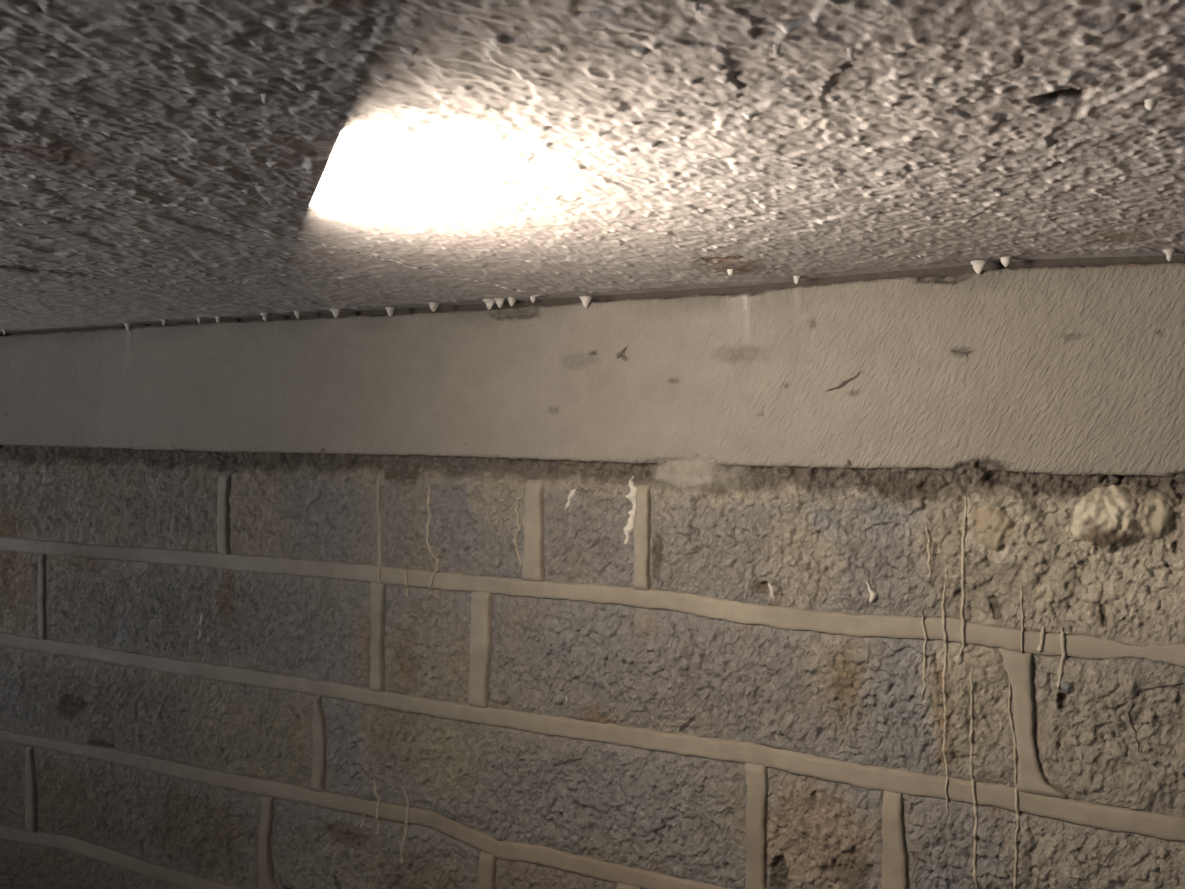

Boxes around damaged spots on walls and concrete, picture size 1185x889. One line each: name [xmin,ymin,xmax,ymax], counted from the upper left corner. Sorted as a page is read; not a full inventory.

spalling [977,460,1018,484]
leakage [925,495,979,889]
leakage [1007,683,1020,889]